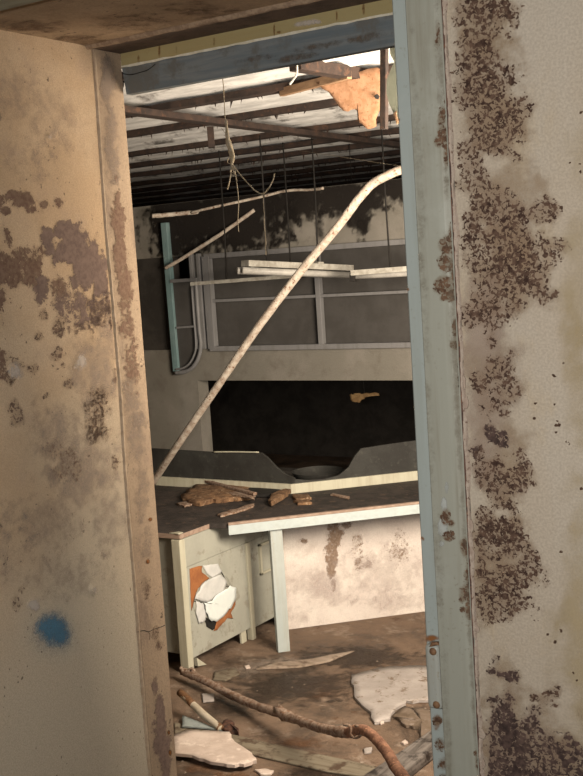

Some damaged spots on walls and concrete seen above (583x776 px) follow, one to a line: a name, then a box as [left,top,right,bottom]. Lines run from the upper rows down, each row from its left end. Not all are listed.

leakage [0,59,144,459]
leakage [323,522,373,592]
leakage [384,529,409,573]
corrosion [440,511,455,542]